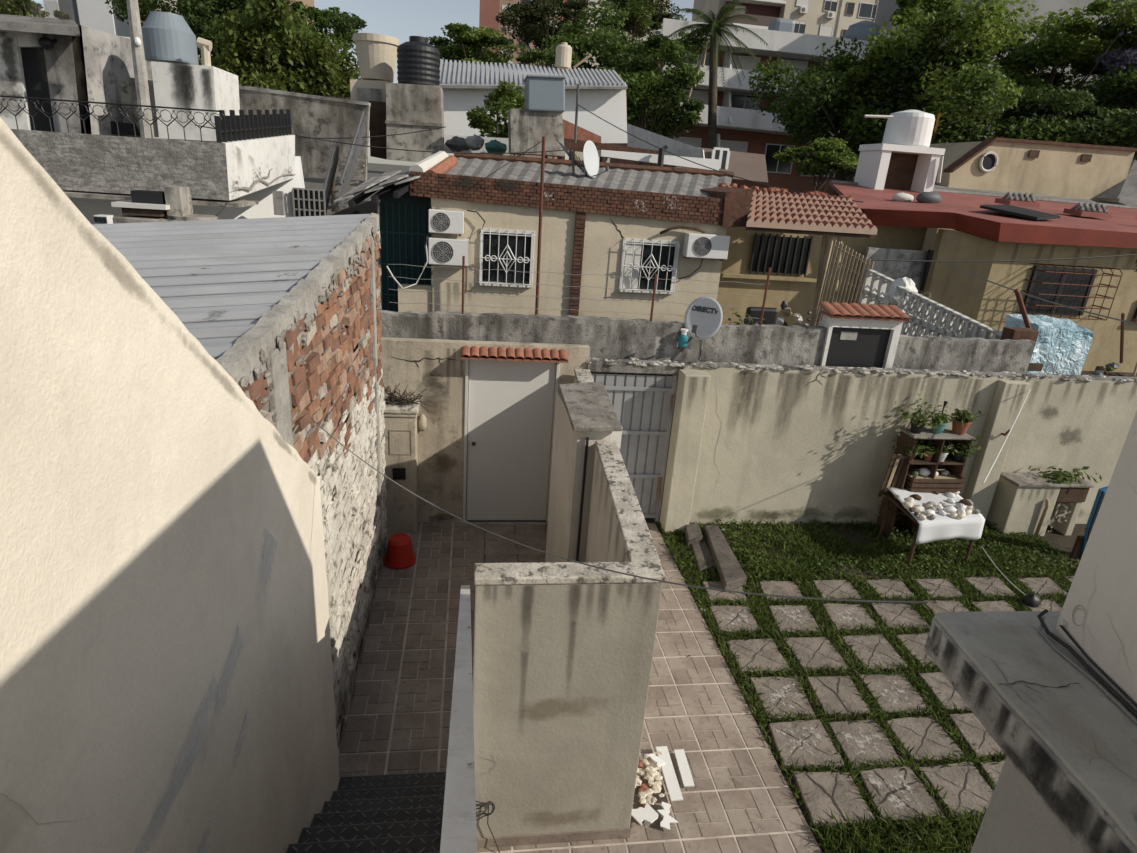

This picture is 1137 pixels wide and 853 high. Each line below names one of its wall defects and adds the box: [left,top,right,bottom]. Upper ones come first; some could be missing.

spalling [216,213,379,400]
crack [711,564,1131,821]
leakage [930,626,954,662]
leakage [962,661,988,704]
leakage [997,704,1015,731]
leakage [1004,738,1132,853]